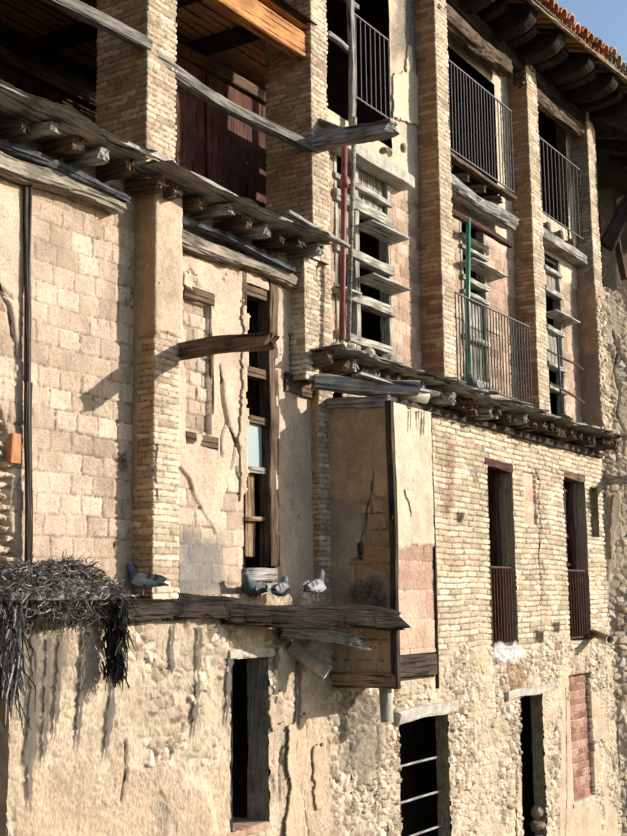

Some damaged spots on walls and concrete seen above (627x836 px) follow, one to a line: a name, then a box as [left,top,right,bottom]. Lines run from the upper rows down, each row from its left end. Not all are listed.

crack [0,283,18,360]
spalling [0,420,22,563]
leakage [25,633,63,808]
leakage [76,632,90,749]
leakage [104,683,116,759]
leakage [192,627,203,738]
leakage [225,658,234,724]
leakage [495,643,526,663]